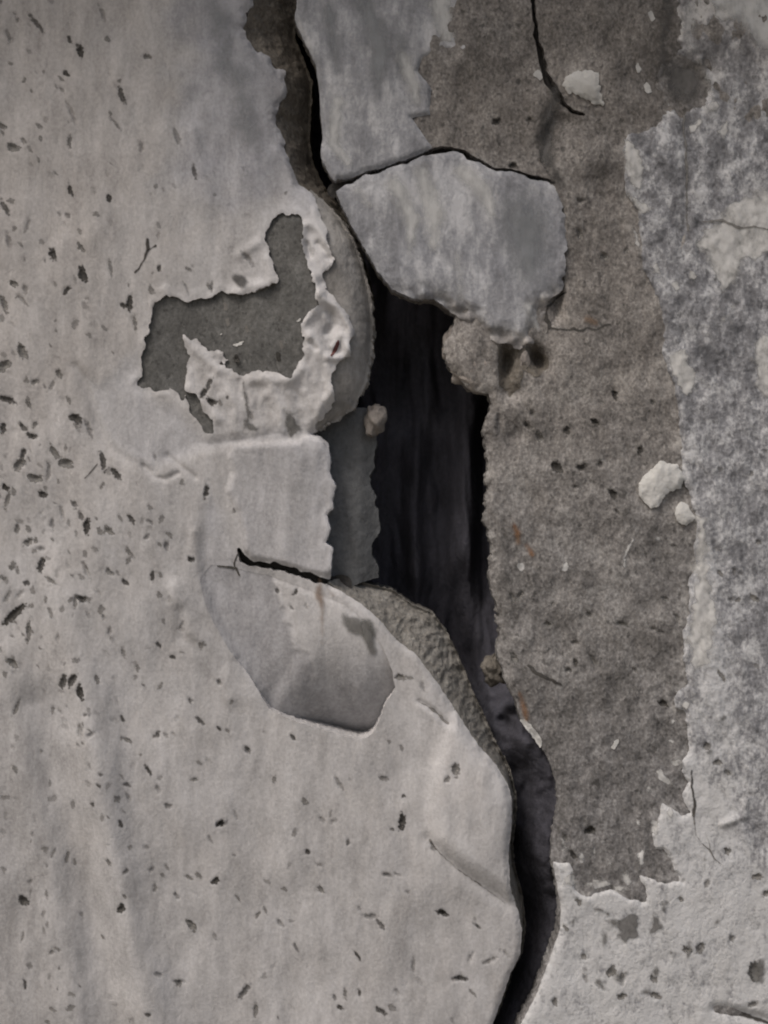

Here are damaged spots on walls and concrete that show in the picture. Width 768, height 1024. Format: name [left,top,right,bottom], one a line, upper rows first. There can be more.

crack [527,0,576,181]
peeling [681,191,768,291]
spalling [63,265,88,295]
peeling [756,335,768,396]
spalling [14,422,74,498]
spalling [15,524,54,583]
spalling [72,502,135,536]
crack [217,0,562,1024]
peeling [137,0,747,1024]
spalling [0,561,52,649]
spalling [59,675,85,701]
peeling [748,960,764,982]